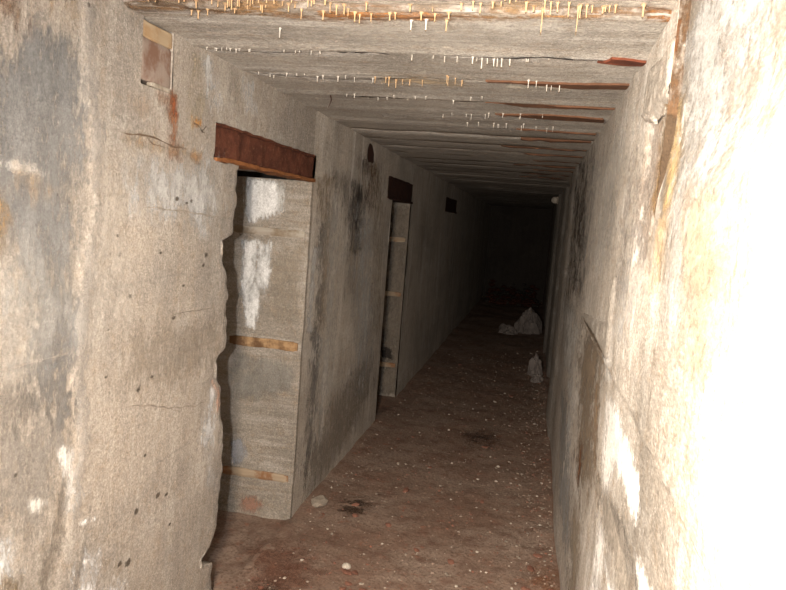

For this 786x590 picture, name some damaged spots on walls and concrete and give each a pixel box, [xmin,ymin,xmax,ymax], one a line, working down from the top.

rust [200,0,309,19]
rust [319,0,570,21]
rust [580,7,623,19]
rust [165,90,178,157]
leakage [128,136,216,234]
leakage [243,179,282,223]
leakage [622,117,663,257]
leakage [668,0,776,394]
leakage [241,240,271,329]
leakage [351,182,410,396]